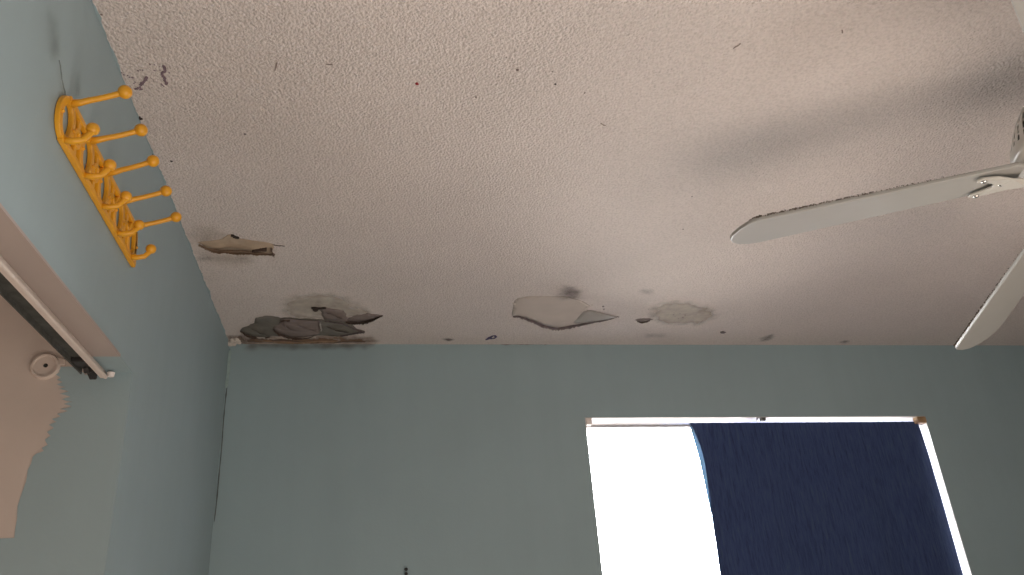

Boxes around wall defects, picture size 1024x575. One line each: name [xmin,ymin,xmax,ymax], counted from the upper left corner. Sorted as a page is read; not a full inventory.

peeling [289,296,365,332]
peeling [512,296,619,331]